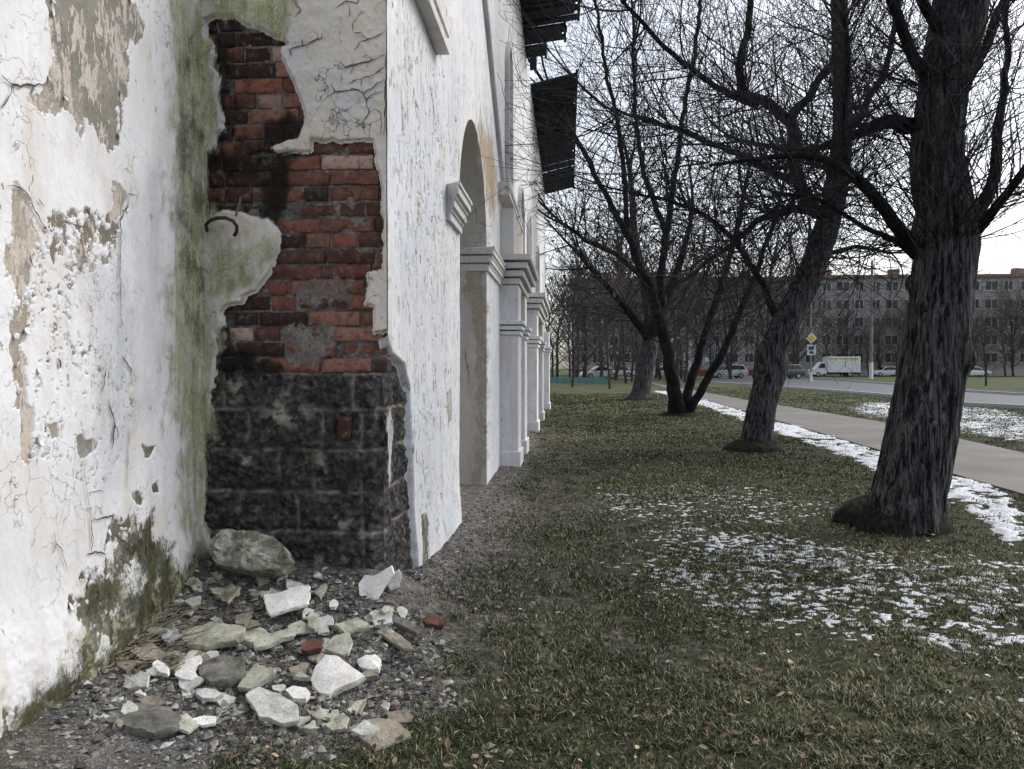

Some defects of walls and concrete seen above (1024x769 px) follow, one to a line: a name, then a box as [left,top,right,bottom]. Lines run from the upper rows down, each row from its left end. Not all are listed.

crack [1,75,50,109]
peeling [2,181,133,465]
flaking render [28,0,144,154]
leakage [177,36,208,345]
crack [288,0,322,55]
spalling [204,0,428,572]
crack [328,0,403,135]
crack [52,356,146,577]
peeling [141,444,155,458]
leakage [16,530,187,731]